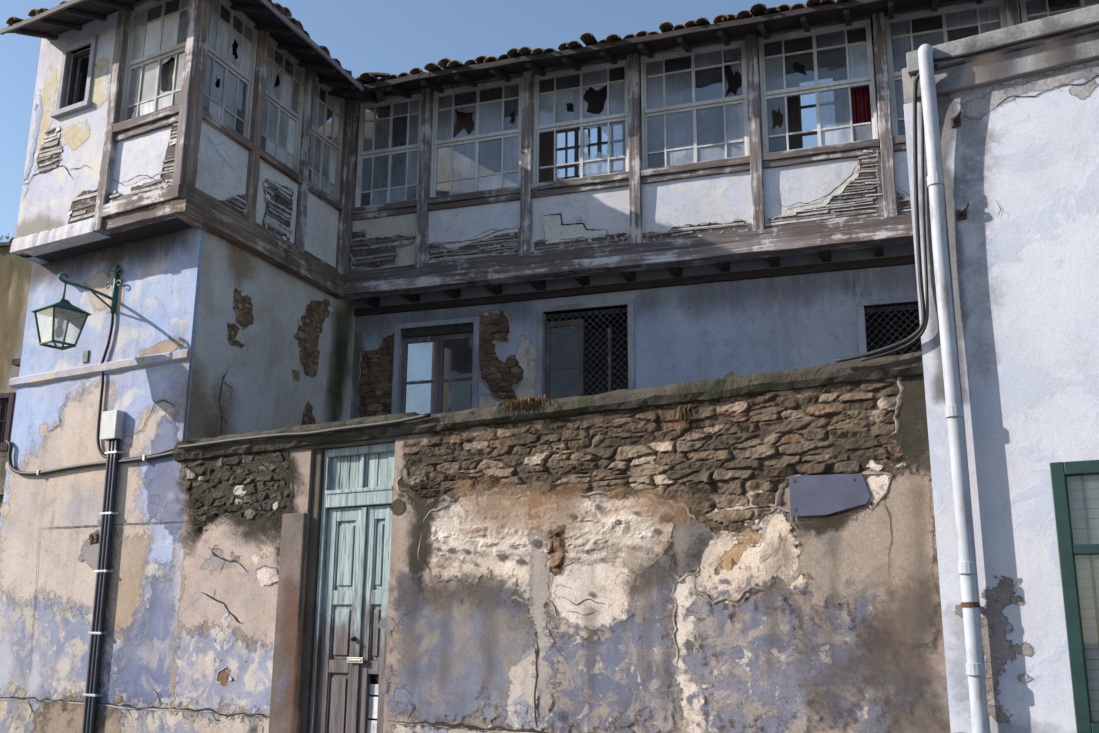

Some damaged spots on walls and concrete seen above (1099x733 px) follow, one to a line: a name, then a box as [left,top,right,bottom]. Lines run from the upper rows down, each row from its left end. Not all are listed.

crack [992,75,1099,110]
peeling [767,153,880,224]
water stain [17,217,62,238]
peeling [643,220,747,241]
crack [136,399,176,433]
peeling [0,380,281,733]
water stain [0,628,16,687]
water stain [26,650,43,695]
crack [0,511,269,724]
crack [388,641,548,733]
peeling [377,457,947,733]
peeling [980,575,1034,724]